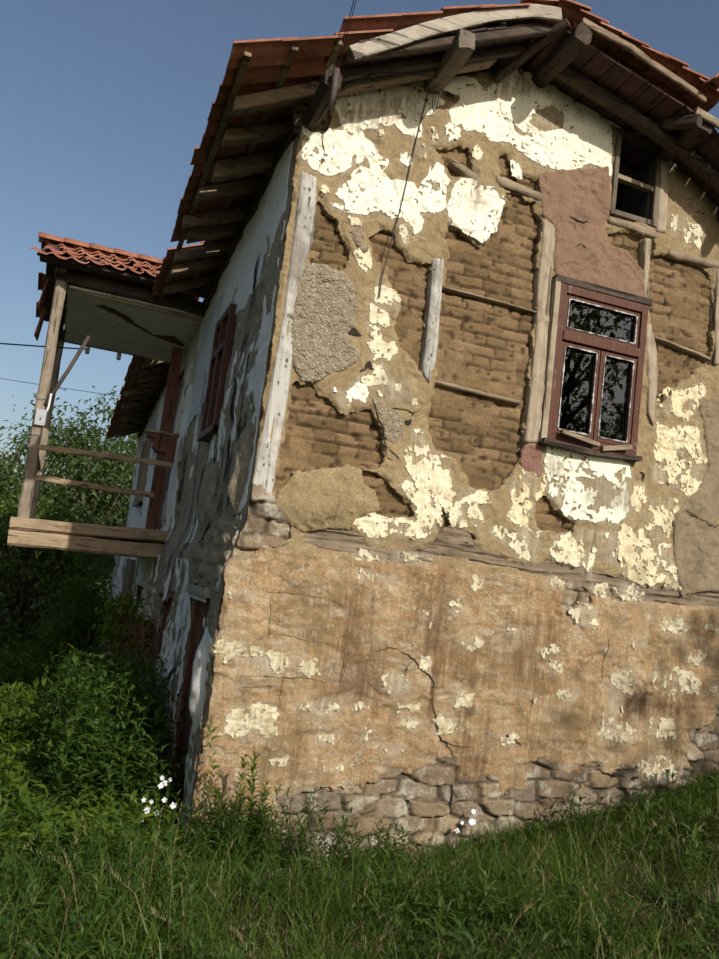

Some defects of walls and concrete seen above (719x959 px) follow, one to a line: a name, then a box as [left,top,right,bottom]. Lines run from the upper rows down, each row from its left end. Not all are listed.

spalling [97,69,717,843]
crack [380,646,470,809]
spalling [275,707,719,865]